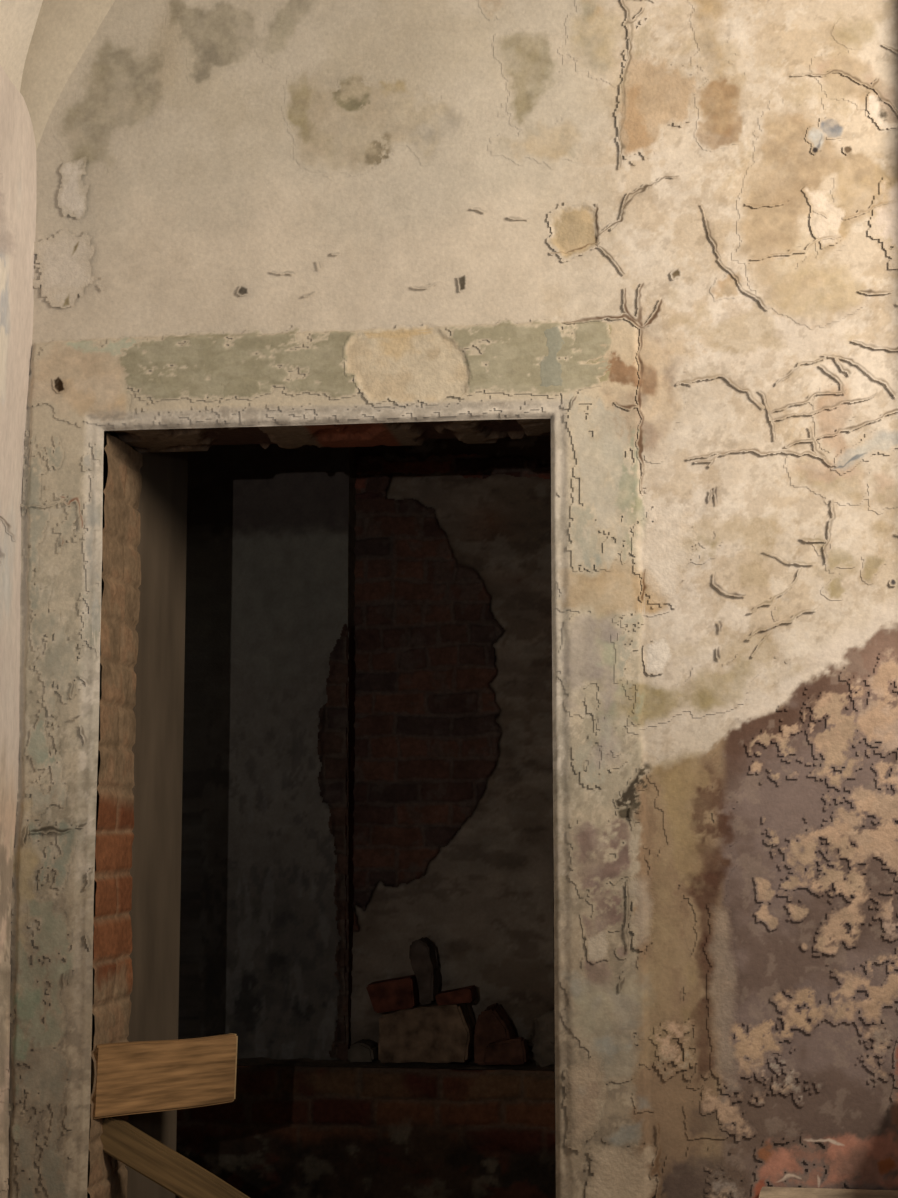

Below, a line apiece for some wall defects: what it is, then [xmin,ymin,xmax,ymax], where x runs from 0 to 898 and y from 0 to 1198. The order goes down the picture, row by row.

leakage [49,0,320,176]
crack [792,68,898,115]
crack [563,0,680,494]
crack [701,197,894,310]
crack [759,339,898,459]
peeling [64,318,700,788]
crack [639,569,649,602]
flaking render [317,453,550,1060]
flaking render [585,930,612,964]
flaking render [628,872,656,951]
peeling [649,645,898,1198]
flaking render [562,1054,665,1198]